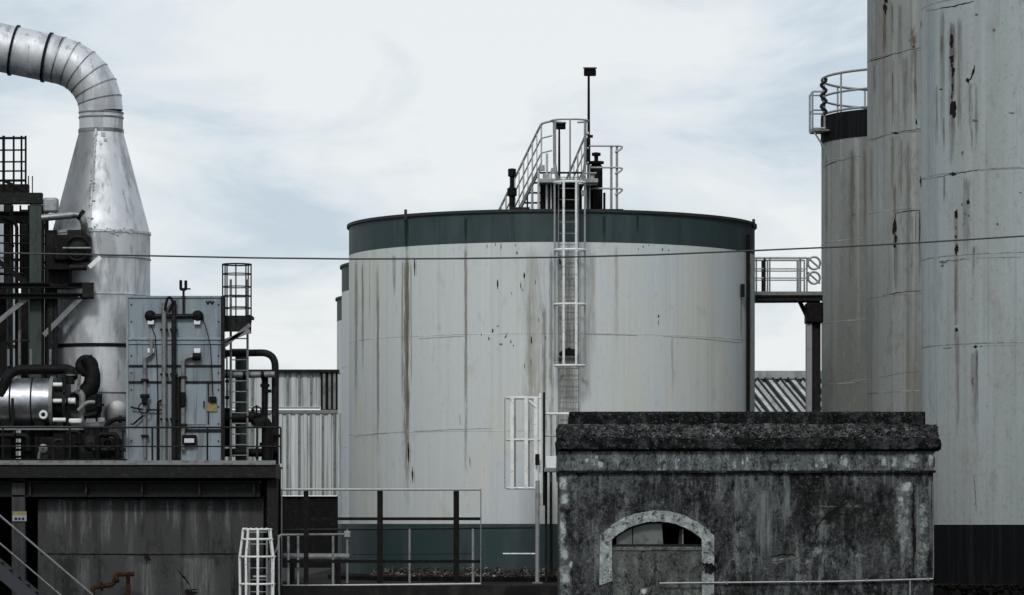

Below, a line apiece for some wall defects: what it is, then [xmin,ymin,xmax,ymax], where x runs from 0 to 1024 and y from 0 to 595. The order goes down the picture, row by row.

corrosion [402,262,412,454]
damp [735,473,813,570]